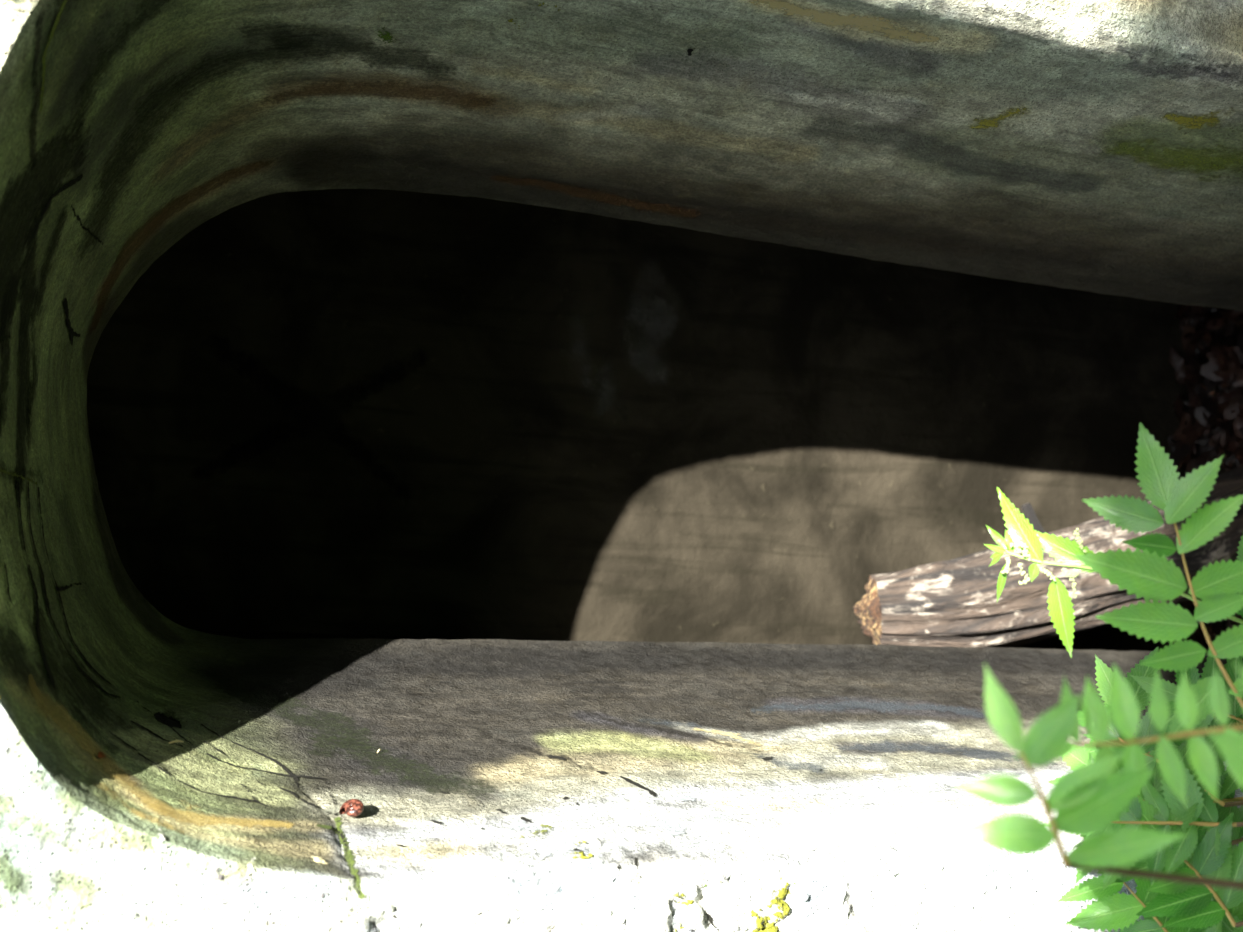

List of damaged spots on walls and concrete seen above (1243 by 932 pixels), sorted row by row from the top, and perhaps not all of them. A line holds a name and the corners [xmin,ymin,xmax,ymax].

damp [0,1,158,500]
damp [86,24,449,248]
crack [3,481,365,899]